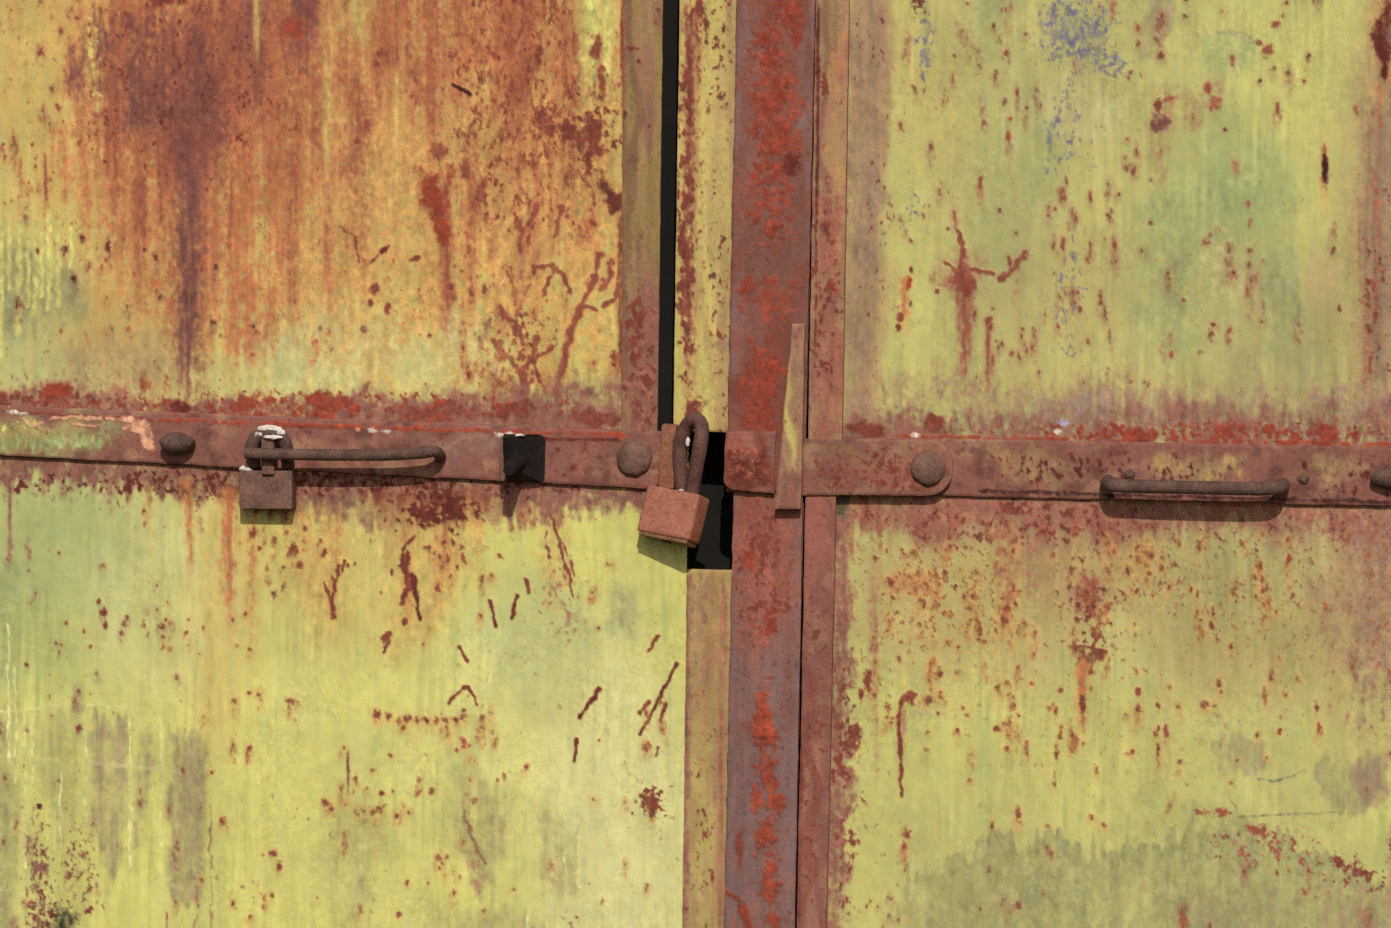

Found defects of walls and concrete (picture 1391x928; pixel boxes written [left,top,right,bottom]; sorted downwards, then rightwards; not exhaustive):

rust [0,0,675,862]
rust [618,0,1391,928]
rust [135,779,209,919]
rust [226,843,288,928]
rust [374,833,479,927]